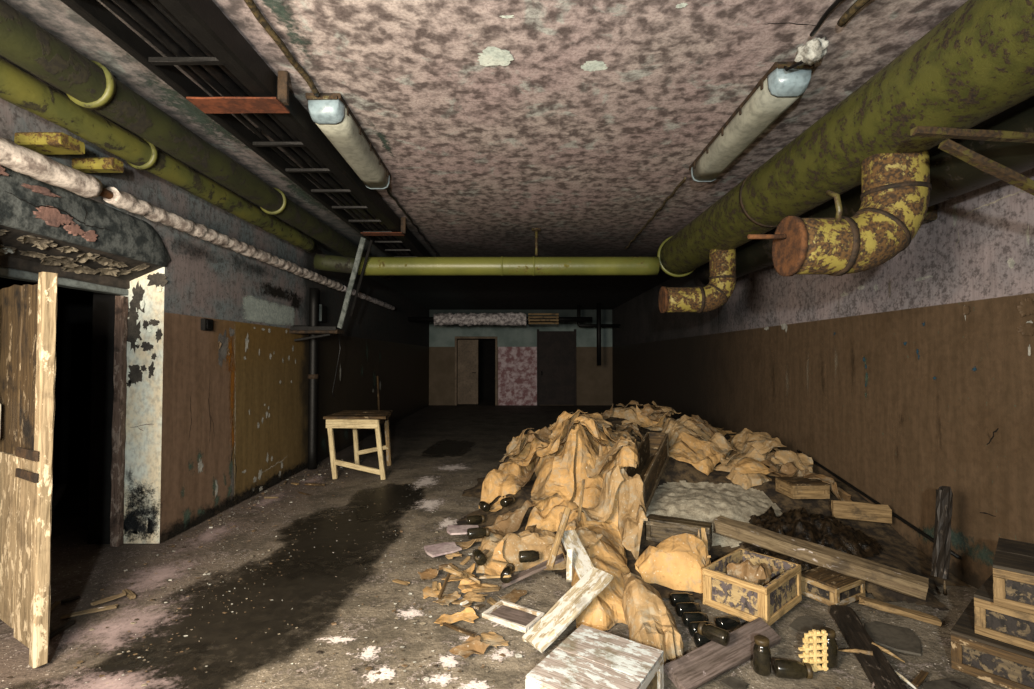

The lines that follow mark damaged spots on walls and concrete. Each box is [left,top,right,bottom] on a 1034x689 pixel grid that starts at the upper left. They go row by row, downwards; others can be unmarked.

peeling [477,47,514,67]
peeling [581,60,608,72]
peeling [0,183,168,387]
peeling [218,327,296,367]
damp [9,440,474,689]
damp [484,645,525,662]
damp [419,655,489,689]